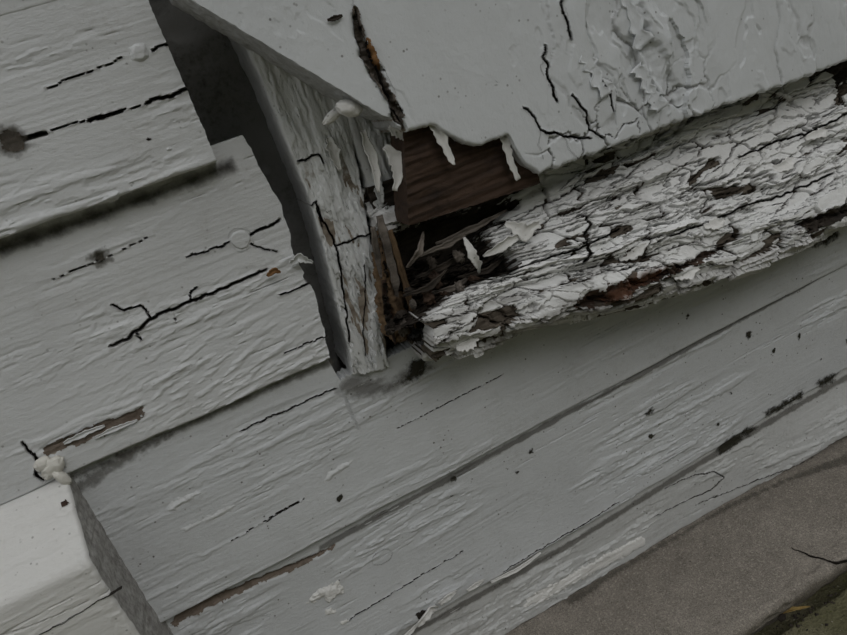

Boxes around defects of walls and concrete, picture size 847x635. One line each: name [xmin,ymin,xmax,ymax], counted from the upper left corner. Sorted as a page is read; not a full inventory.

crack [50,57,122,88]
crack [25,89,187,139]
crack [523,46,603,159]
peeling [805,128,828,141]
peeling [360,125,541,337]
peeling [795,202,847,234]
crack [110,219,280,346]
crack [311,201,371,355]
peeling [573,247,726,310]
peeling [43,407,145,456]
crack [241,388,336,431]
peeling [170,544,336,627]